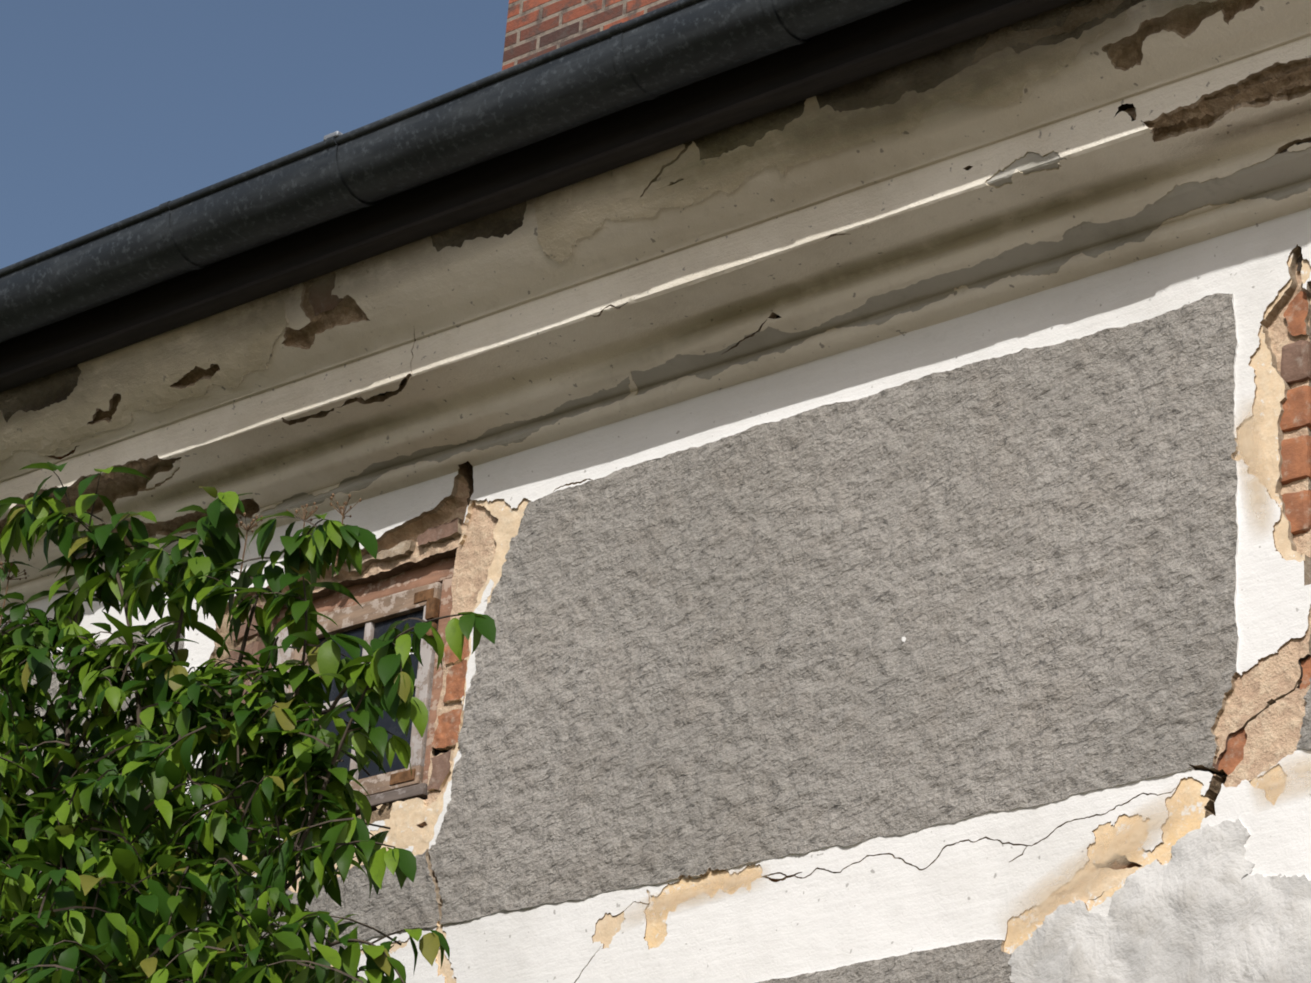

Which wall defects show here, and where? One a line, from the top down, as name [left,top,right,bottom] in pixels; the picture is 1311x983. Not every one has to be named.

peeling [534,0,1260,263]
spalling [1115,57,1311,142]
peeling [0,278,371,460]
peeling [209,137,1311,694]
spalling [0,455,208,561]
peeling [357,629,476,856]
crack [425,849,443,920]
peeling [574,911,626,983]
peeling [644,864,763,949]
crack [761,634,1311,882]
leakage [1035,817,1163,911]
peeling [1001,604,1311,954]